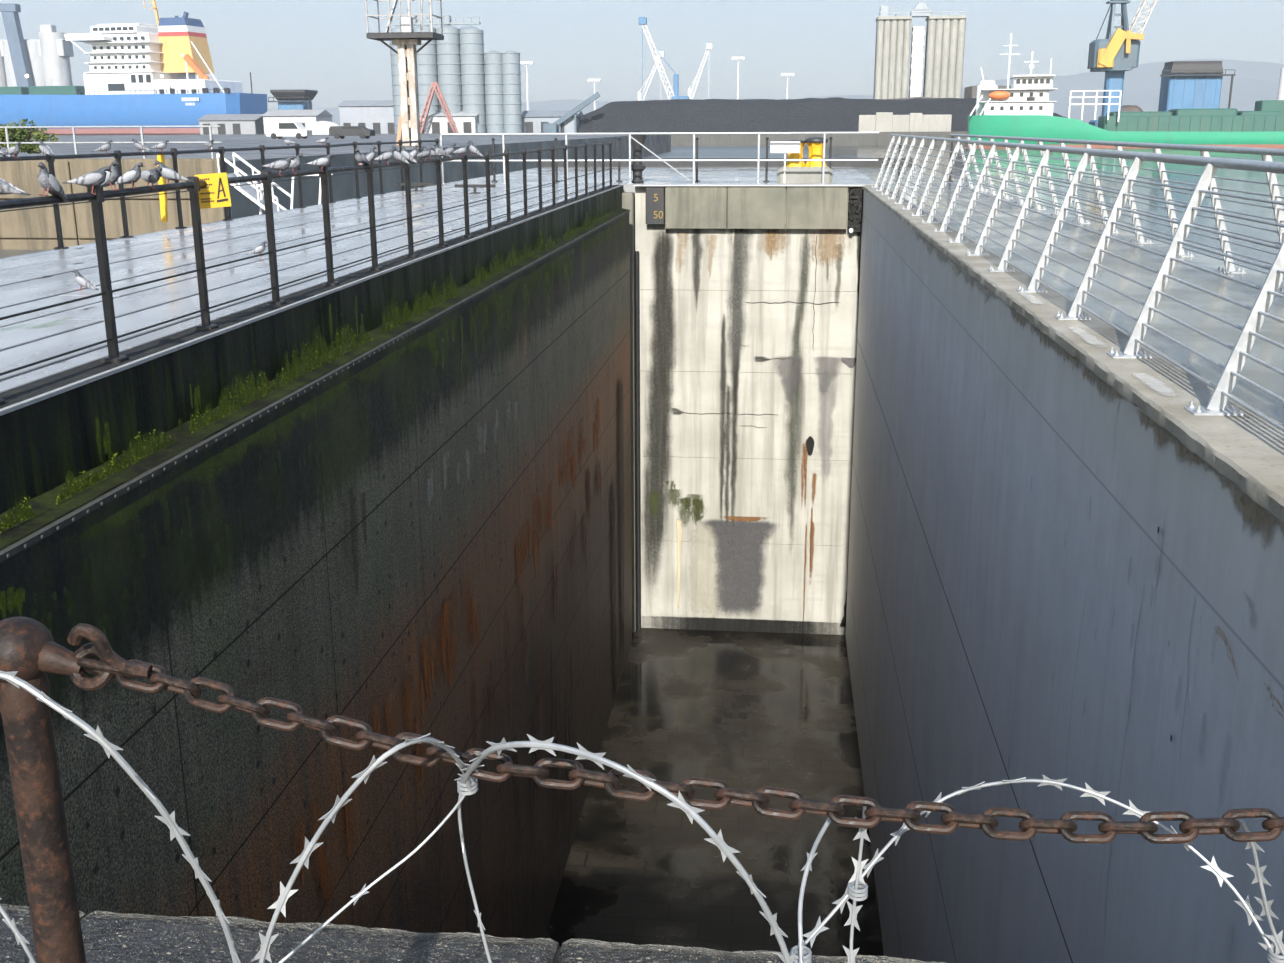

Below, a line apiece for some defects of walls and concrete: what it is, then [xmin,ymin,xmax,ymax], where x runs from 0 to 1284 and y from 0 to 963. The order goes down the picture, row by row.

damp [644,229,847,635]
damp [820,357,857,392]